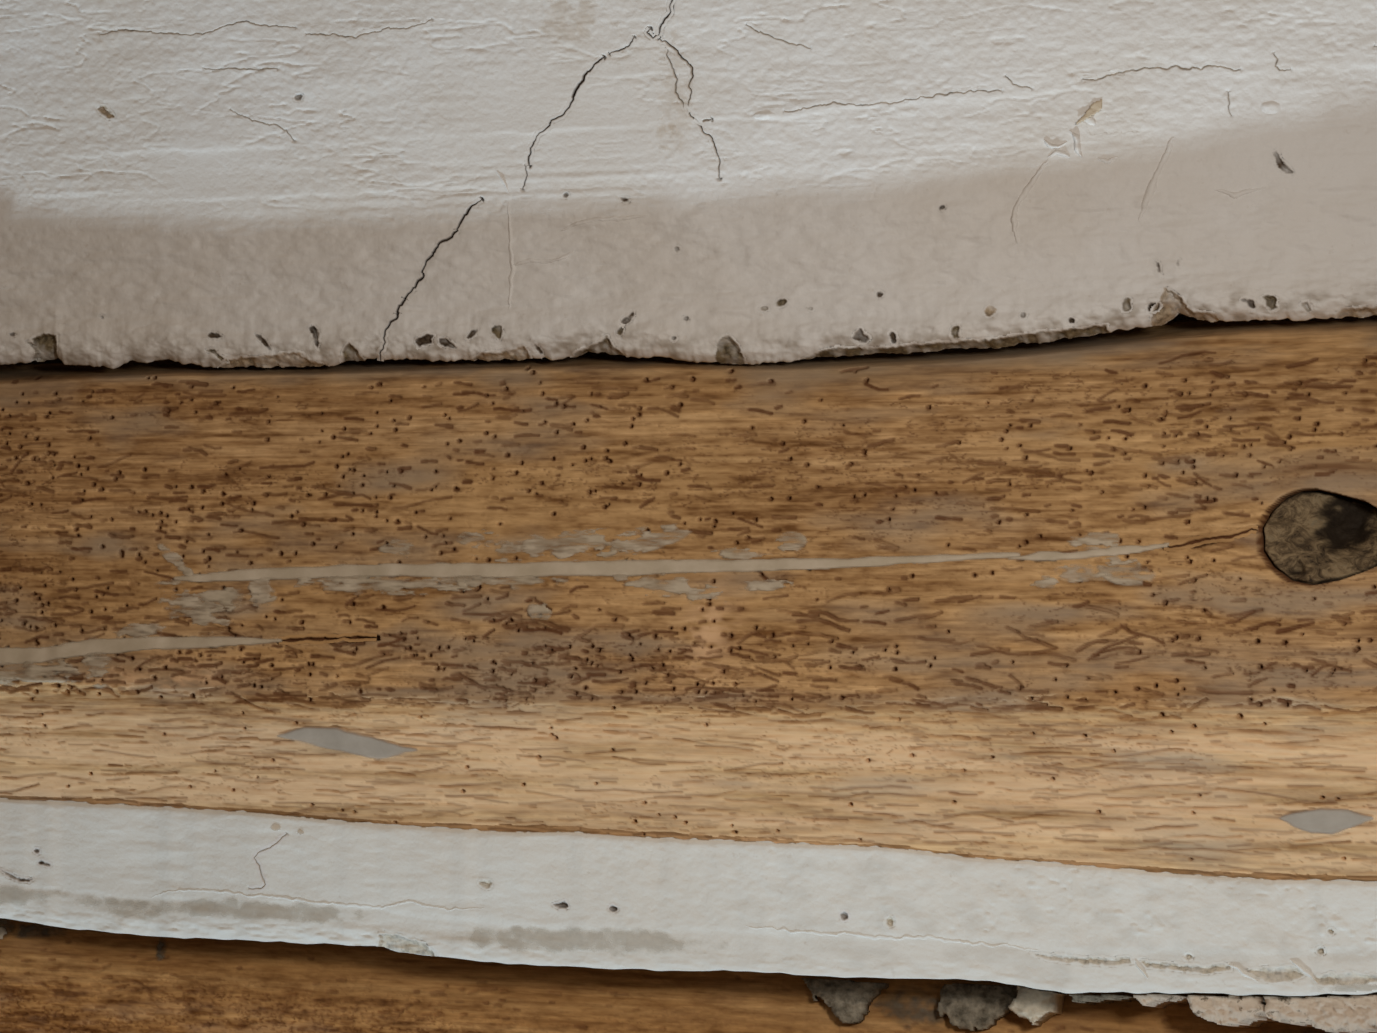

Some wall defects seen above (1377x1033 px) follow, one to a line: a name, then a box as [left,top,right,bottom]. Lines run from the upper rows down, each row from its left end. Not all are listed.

crack [745,22,811,52]
crack [519,0,724,190]
crack [377,197,483,361]
spalling [758,295,815,313]
spalling [796,257,1221,360]
spalling [1239,291,1280,313]
spalling [1332,305,1377,318]
spalling [0,330,60,362]
spalling [204,324,366,368]
spalling [413,321,544,361]
spalling [570,307,637,357]
spalling [712,332,748,364]